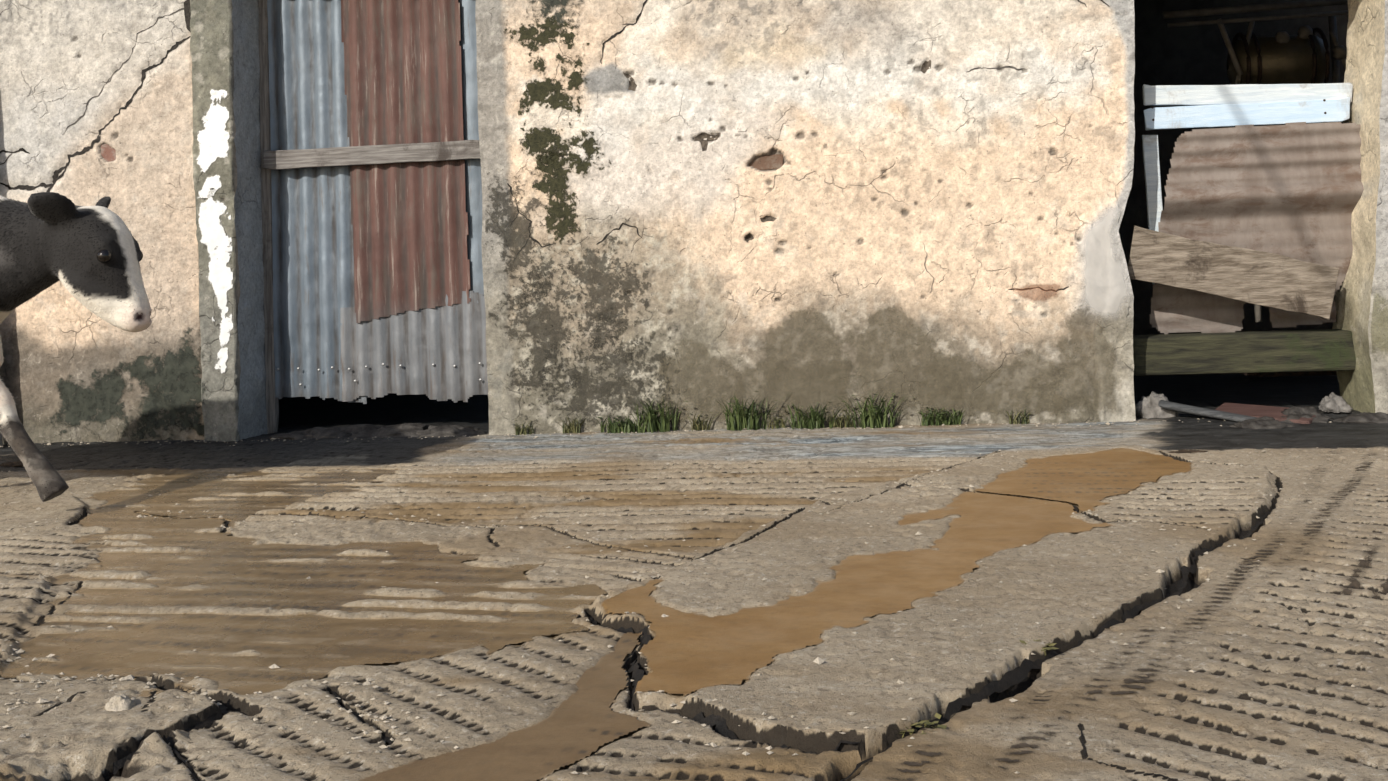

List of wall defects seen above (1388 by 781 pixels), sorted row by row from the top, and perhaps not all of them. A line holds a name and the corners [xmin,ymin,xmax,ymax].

crack [0,8,190,192]
water stain [526,0,583,28]
crack [600,0,647,64]
peeling [196,89,233,373]
water stain [485,171,687,431]